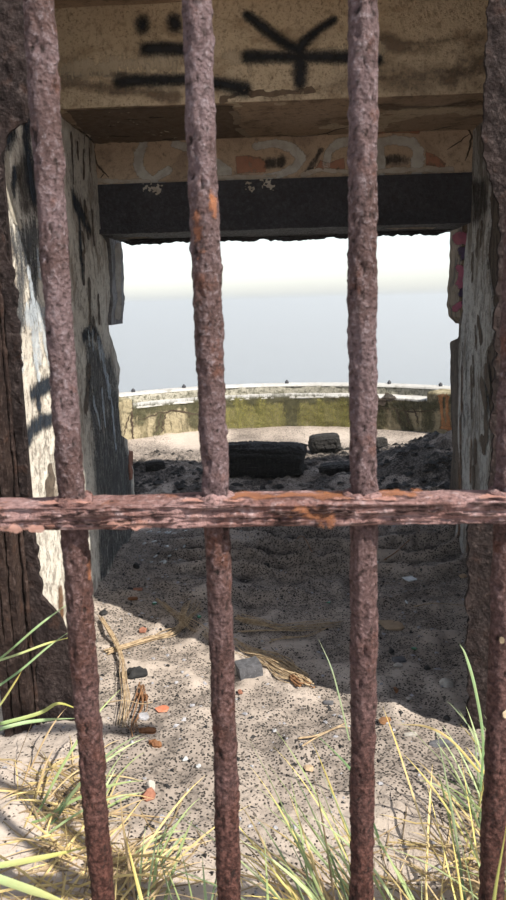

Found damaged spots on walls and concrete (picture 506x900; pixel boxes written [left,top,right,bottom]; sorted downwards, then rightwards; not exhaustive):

spalling [215,86,316,139]
spalling [67,107,186,184]
rust [209,194,217,219]
leakage [225,392,350,428]
leakage [376,394,451,431]